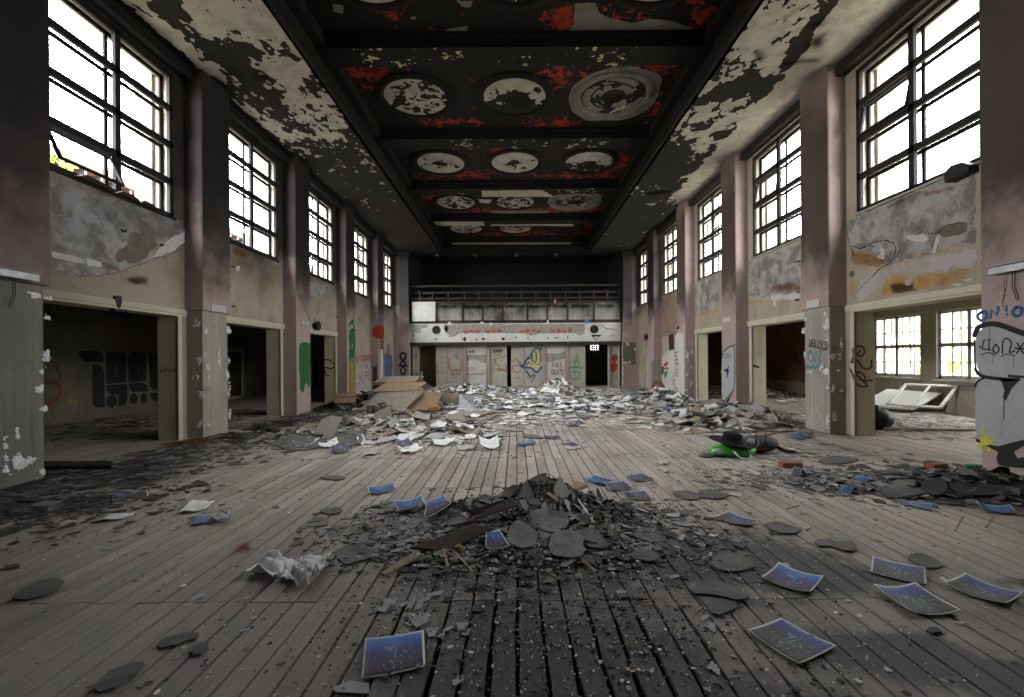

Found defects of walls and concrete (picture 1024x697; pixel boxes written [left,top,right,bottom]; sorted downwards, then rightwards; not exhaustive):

peeling [362,0,416,28]
flaking render [539,0,717,30]
peeling [121,0,396,211]
peeling [345,47,679,245]
peeling [631,0,907,223]
peeling [50,183,185,278]
peeling [847,173,978,301]
peeling [34,349,52,413]
peeling [803,312,844,393]
peeling [0,427,46,476]